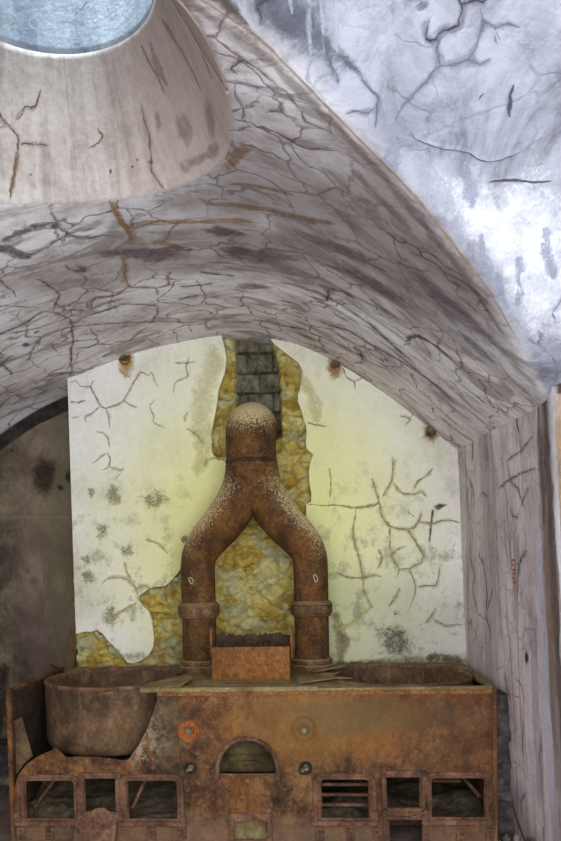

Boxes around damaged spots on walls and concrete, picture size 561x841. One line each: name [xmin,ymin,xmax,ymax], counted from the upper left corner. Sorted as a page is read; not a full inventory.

crack [0,90,46,200]
crack [140,101,164,189]
crack [220,51,335,151]
crack [320,0,521,132]
crack [0,199,211,480]
crack [244,285,454,394]
damp [32,460,71,490]
flaking render [212,337,313,516]
crack [101,562,151,623]
flaking render [76,570,183,667]
flaking render [215,517,295,659]
crack [309,437,536,639]